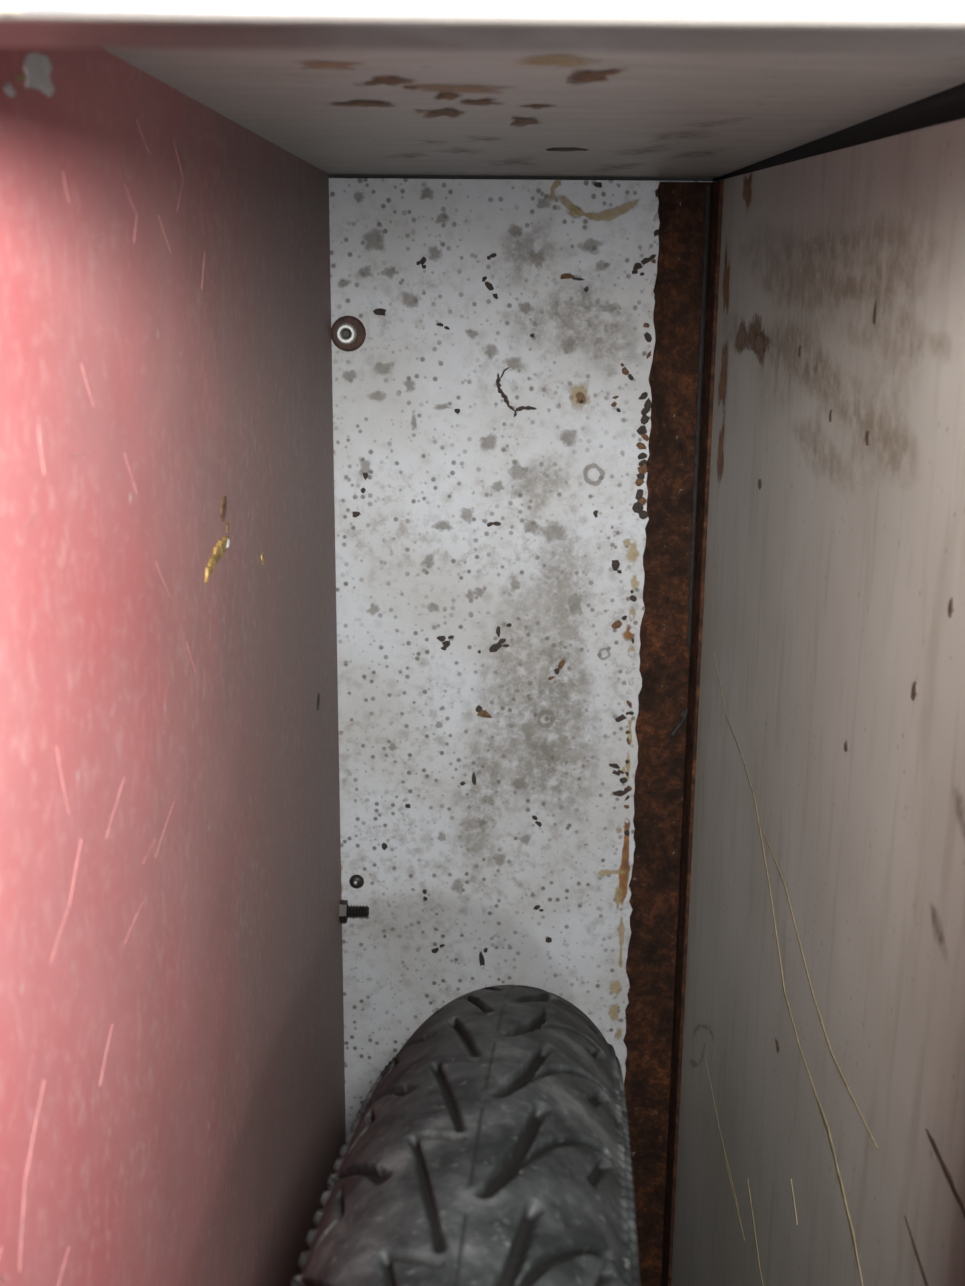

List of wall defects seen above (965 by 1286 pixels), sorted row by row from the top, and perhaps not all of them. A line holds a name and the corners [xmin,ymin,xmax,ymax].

peeling [3,52,55,98]
rust [527,56,621,85]
rust [330,76,499,118]
rust [511,105,552,127]
damp [583,239,608,269]
damp [488,346,519,369]
damp [494,466,547,491]
damp [583,464,604,485]
damp [526,522,562,539]
rust [624,540,638,588]
rust [624,609,635,651]
damp [506,654,576,771]